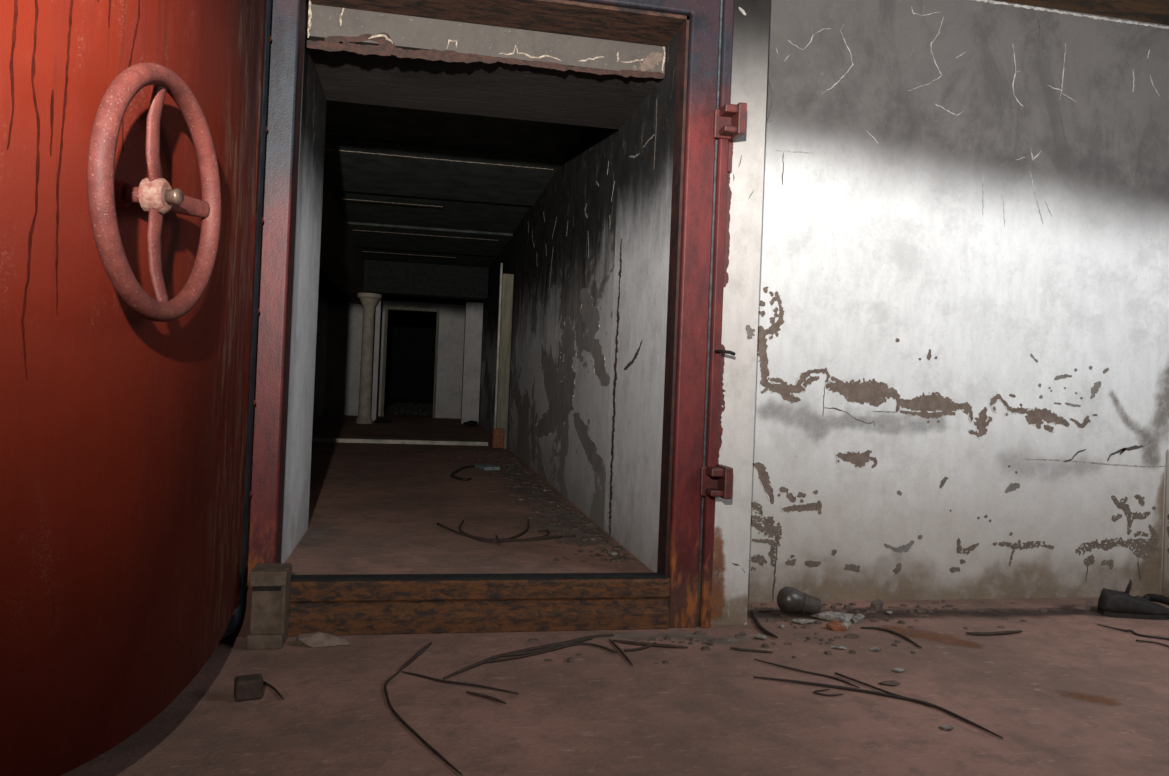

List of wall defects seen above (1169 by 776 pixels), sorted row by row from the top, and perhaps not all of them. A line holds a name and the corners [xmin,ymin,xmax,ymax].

peeling [746,286,1109,439]
rust [711,528,725,620]
spalling [750,461,837,571]
peeling [884,535,923,574]
damp [711,566,1104,625]
peeling [950,538,979,573]
peeling [1005,465,1020,493]
peeling [993,532,1054,566]
spalling [1075,494,1169,570]
damp [1111,368,1169,597]